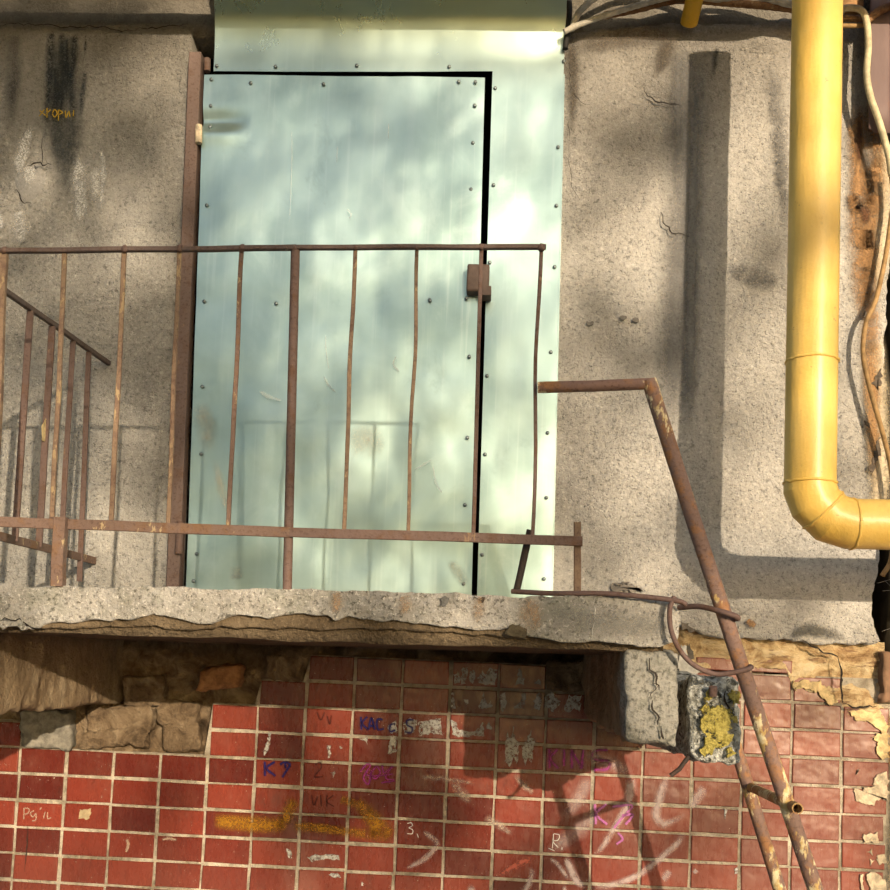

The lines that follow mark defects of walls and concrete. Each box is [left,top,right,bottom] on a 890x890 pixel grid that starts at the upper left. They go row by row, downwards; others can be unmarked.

damp [14,129,36,181]
crack [27,138,51,169]
damp [46,33,107,220]
corrosion [848,109,884,468]
spalling [0,613,528,640]
flaking render [119,640,583,754]
crack [649,658,664,739]
peeling [792,679,838,706]
crack [803,640,876,709]
peeling [848,709,890,760]
peeling [853,771,890,806]
peeling [859,832,887,890]